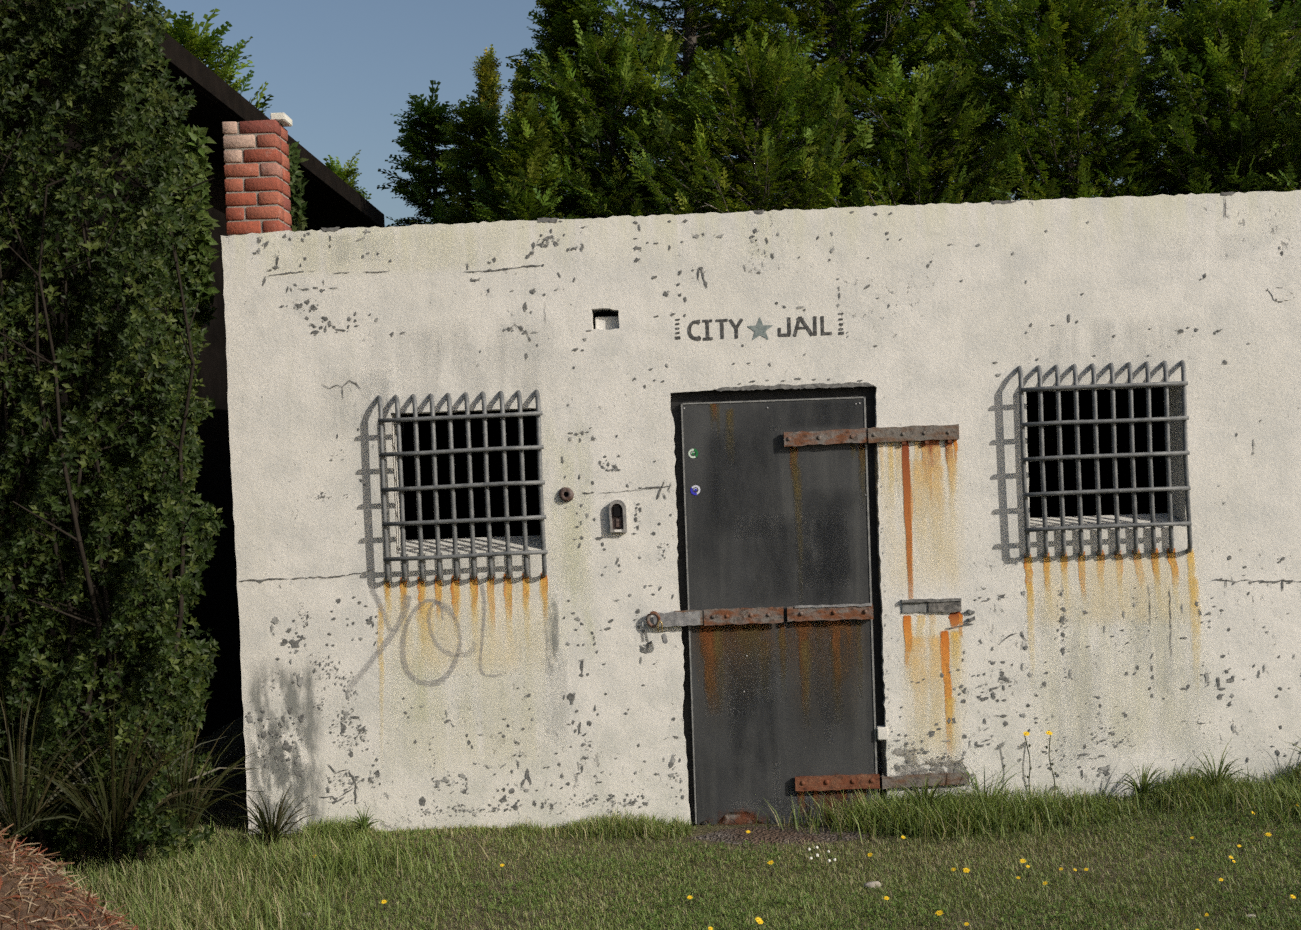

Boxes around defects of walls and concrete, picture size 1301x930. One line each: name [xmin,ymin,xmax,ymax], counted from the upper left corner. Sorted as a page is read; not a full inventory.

corrosion [890,439,958,583]
crack [242,569,373,583]
corrosion [384,573,548,618]
corrosion [1024,548,1198,616]
crack [1214,578,1301,595]
peeling [245,596,381,804]
corrosion [700,620,861,687]
corrosion [903,611,973,727]
peeling [1181,654,1295,708]